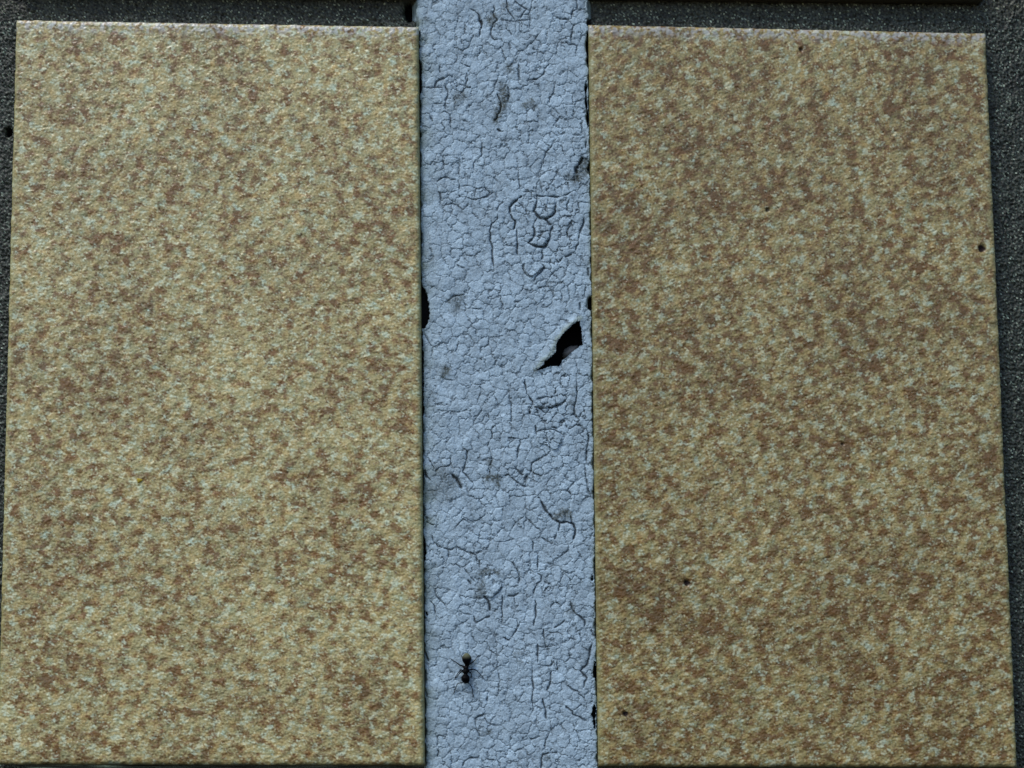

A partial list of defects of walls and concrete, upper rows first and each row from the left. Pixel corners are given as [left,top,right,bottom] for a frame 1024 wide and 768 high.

crack [490,196,556,265]
crack [538,497,576,539]